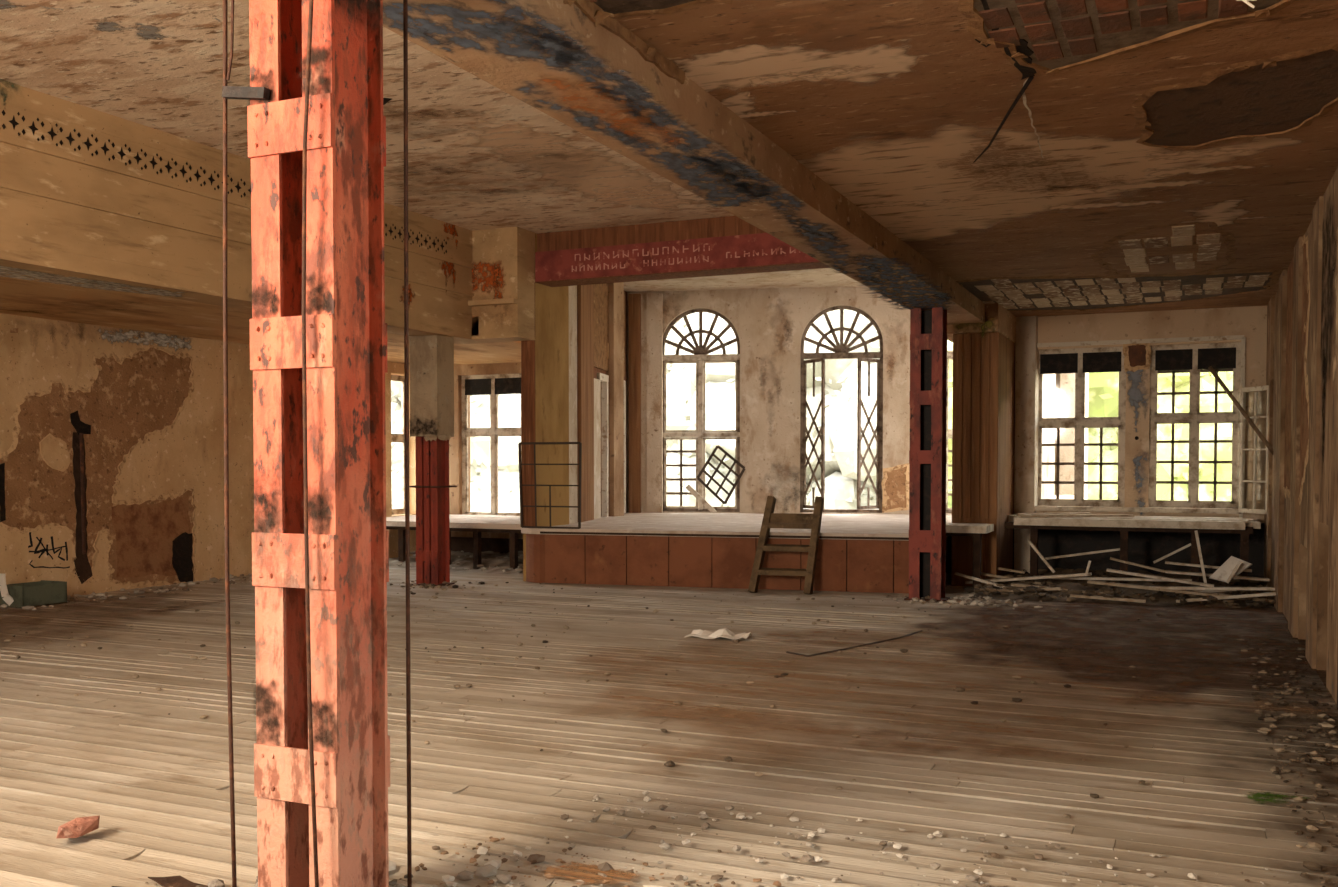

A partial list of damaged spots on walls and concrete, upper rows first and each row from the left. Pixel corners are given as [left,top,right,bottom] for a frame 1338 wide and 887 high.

crack [973,0,1044,163]
flaking render [383,0,1338,505]
flaking render [0,329,252,611]
flaking render [881,463,909,513]
peeling [1133,456,1147,515]